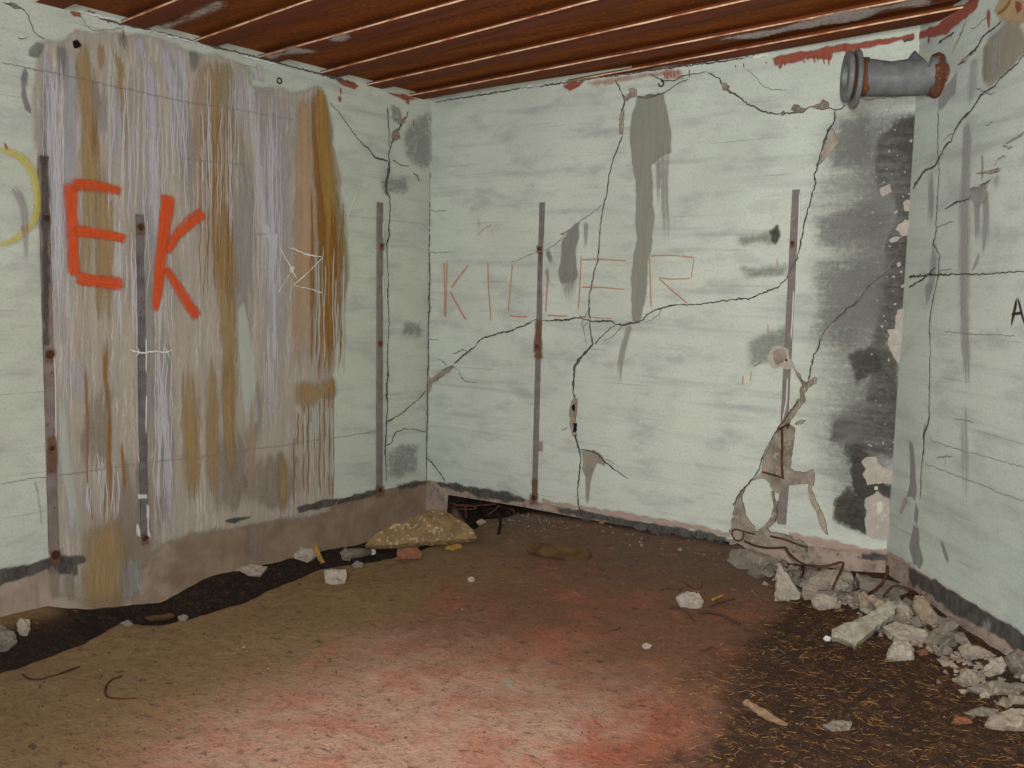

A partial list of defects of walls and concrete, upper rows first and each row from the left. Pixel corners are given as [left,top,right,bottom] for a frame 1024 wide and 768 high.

corrosion [47,436,57,472]
corrosion [76,46,126,315]
corrosion [85,345,125,519]
corrosion [182,63,242,495]
corrosion [279,90,347,510]
water stain [619,95,671,376]
crack [437,54,902,510]
spalling [728,345,844,590]
water stain [822,116,914,534]
peeling [870,261,905,364]
peeling [871,155,910,247]
crack [808,55,1024,501]